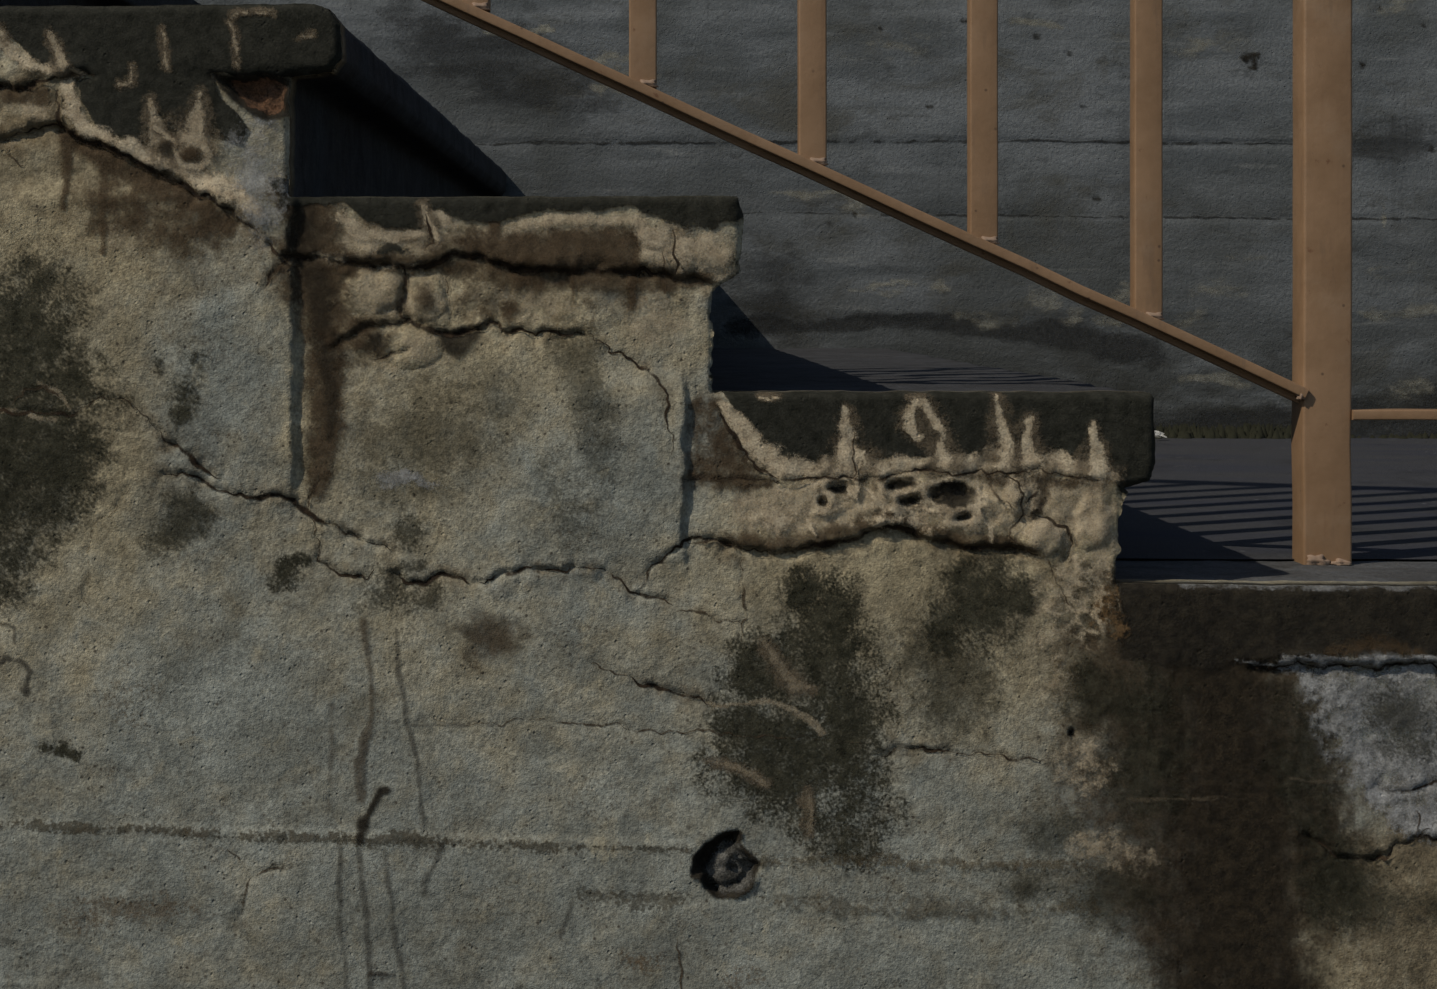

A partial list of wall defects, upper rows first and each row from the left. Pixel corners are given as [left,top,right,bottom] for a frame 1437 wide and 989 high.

peeling [0,3,342,144]
damp [0,7,733,499]
peeling [268,176,744,266]
crack [0,72,1100,639]
damp [728,312,1164,365]
damp [0,251,133,694]
spalling [820,482,850,510]
spalling [887,479,975,522]
peeling [709,374,1155,494]
damp [683,392,1437,989]
crack [1314,780,1437,861]